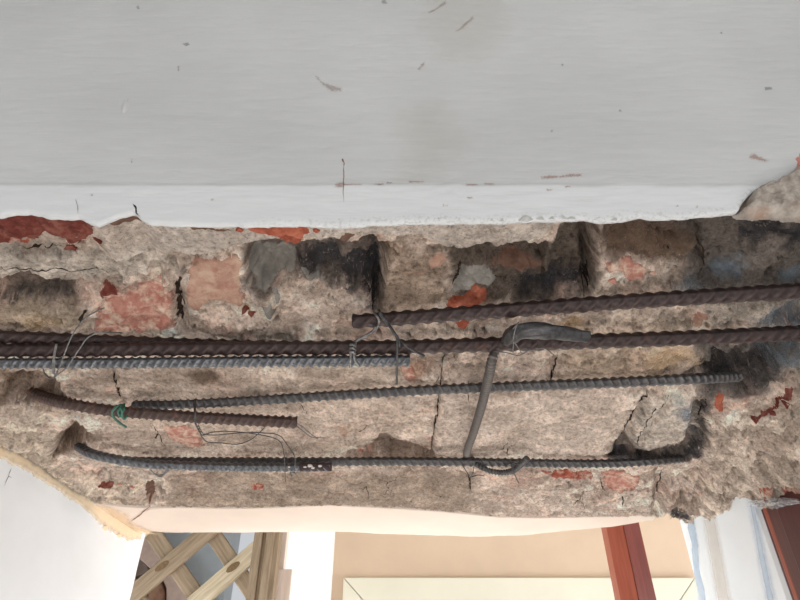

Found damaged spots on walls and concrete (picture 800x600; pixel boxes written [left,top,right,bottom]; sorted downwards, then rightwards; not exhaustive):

spalling [0,215,102,251]
spalling [110,216,141,226]
spalling [190,220,320,243]
water stain [299,241,380,311]
spalling [94,273,177,334]
crack [175,277,185,322]
crack [431,355,445,449]
crack [615,391,669,444]
spalling [750,387,793,424]
peeling [0,446,143,541]
spalling [145,479,156,496]
spalling [541,468,640,493]